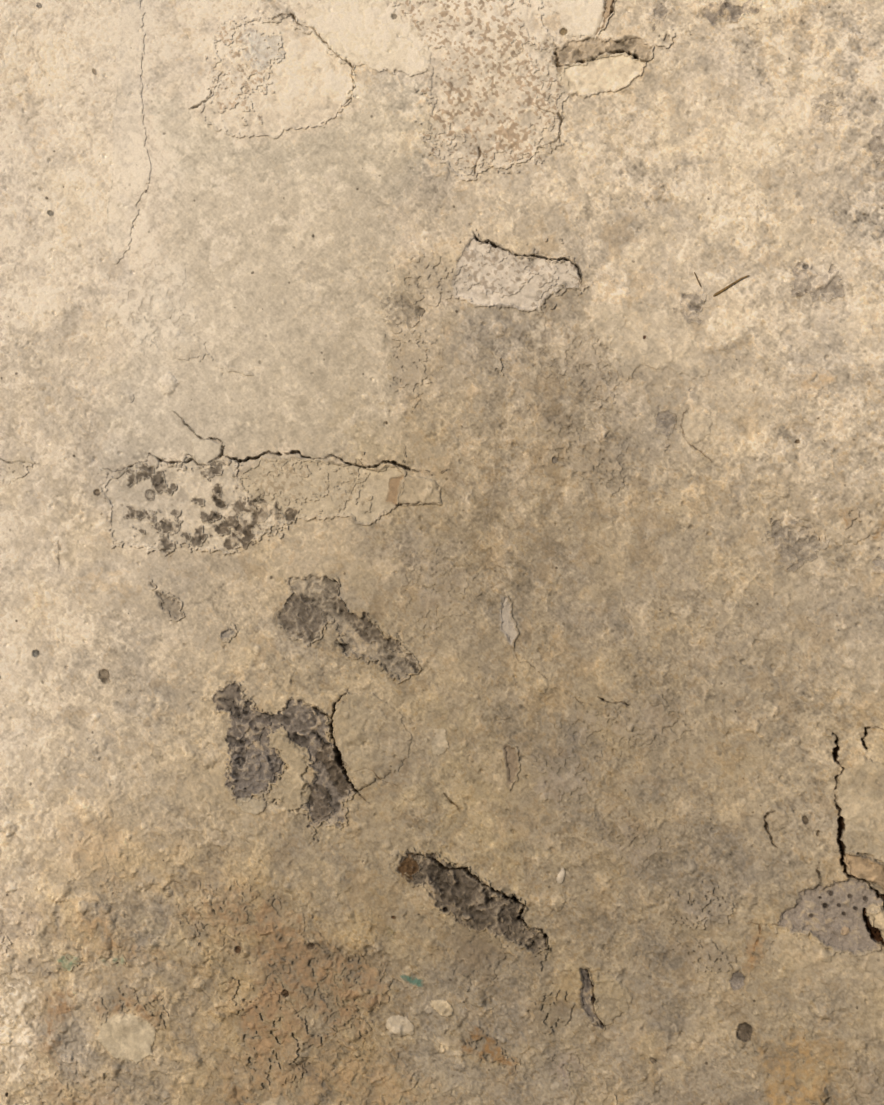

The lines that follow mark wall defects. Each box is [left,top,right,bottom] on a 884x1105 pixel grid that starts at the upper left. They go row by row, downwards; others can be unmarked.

peeling [193,0,654,181]
peeling [450,227,589,313]
peeling [93,437,442,556]
spalling [275,572,422,684]
spalling [209,681,412,841]
spalling [391,847,551,955]
spalling [765,755,884,1000]
crack [815,726,884,947]
peeling [577,967,632,1031]